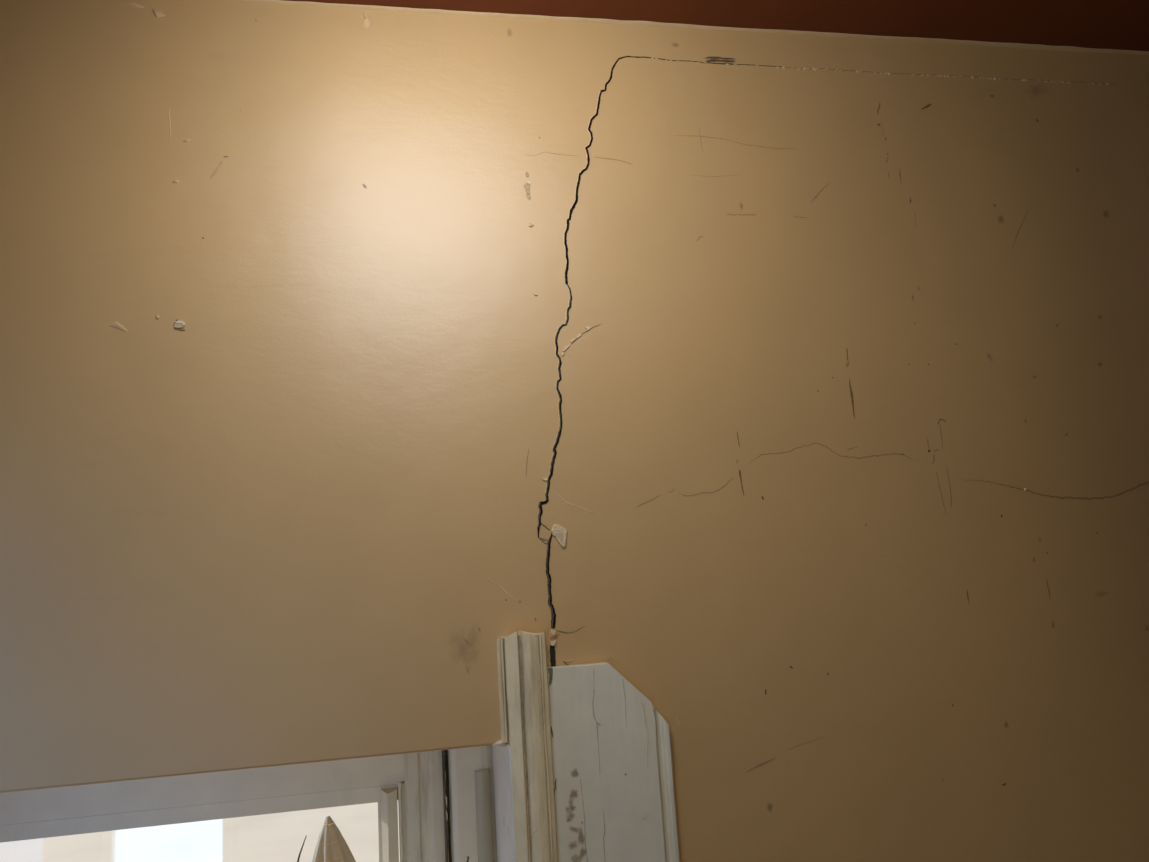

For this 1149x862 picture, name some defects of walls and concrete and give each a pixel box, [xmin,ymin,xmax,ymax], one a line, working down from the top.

crack [537,56,1111,636]